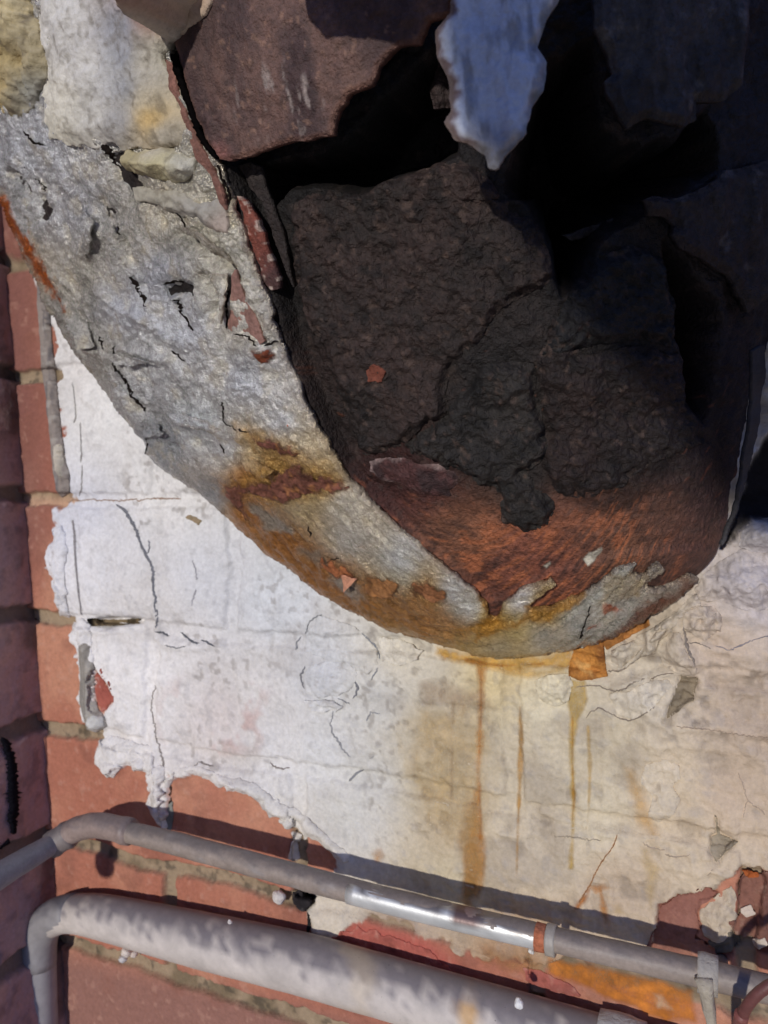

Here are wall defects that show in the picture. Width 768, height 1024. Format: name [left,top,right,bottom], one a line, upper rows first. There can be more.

peeling [430,0,559,171]
peeling [591,0,750,130]
crack [129,277,194,331]
crack [98,337,146,411]
crack [219,402,247,454]
crack [64,382,215,649]
corrosion [225,439,350,526]
corrosion [320,557,446,603]
corrosion [439,619,650,799]
peeling [179,765,350,863]
corrosion [533,921,694,1021]
spalling [647,887,717,957]